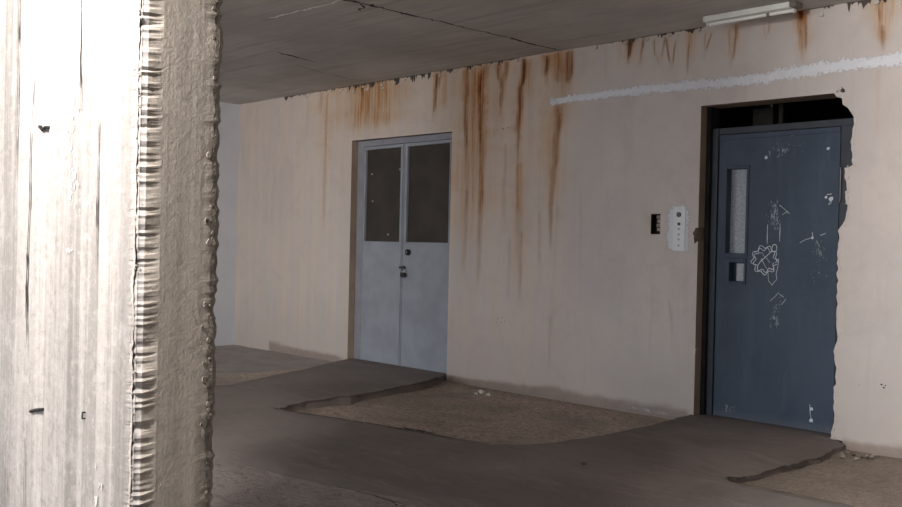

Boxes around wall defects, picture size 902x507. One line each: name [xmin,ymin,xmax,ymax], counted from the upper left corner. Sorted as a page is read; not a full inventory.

spalling [834,87,857,384]